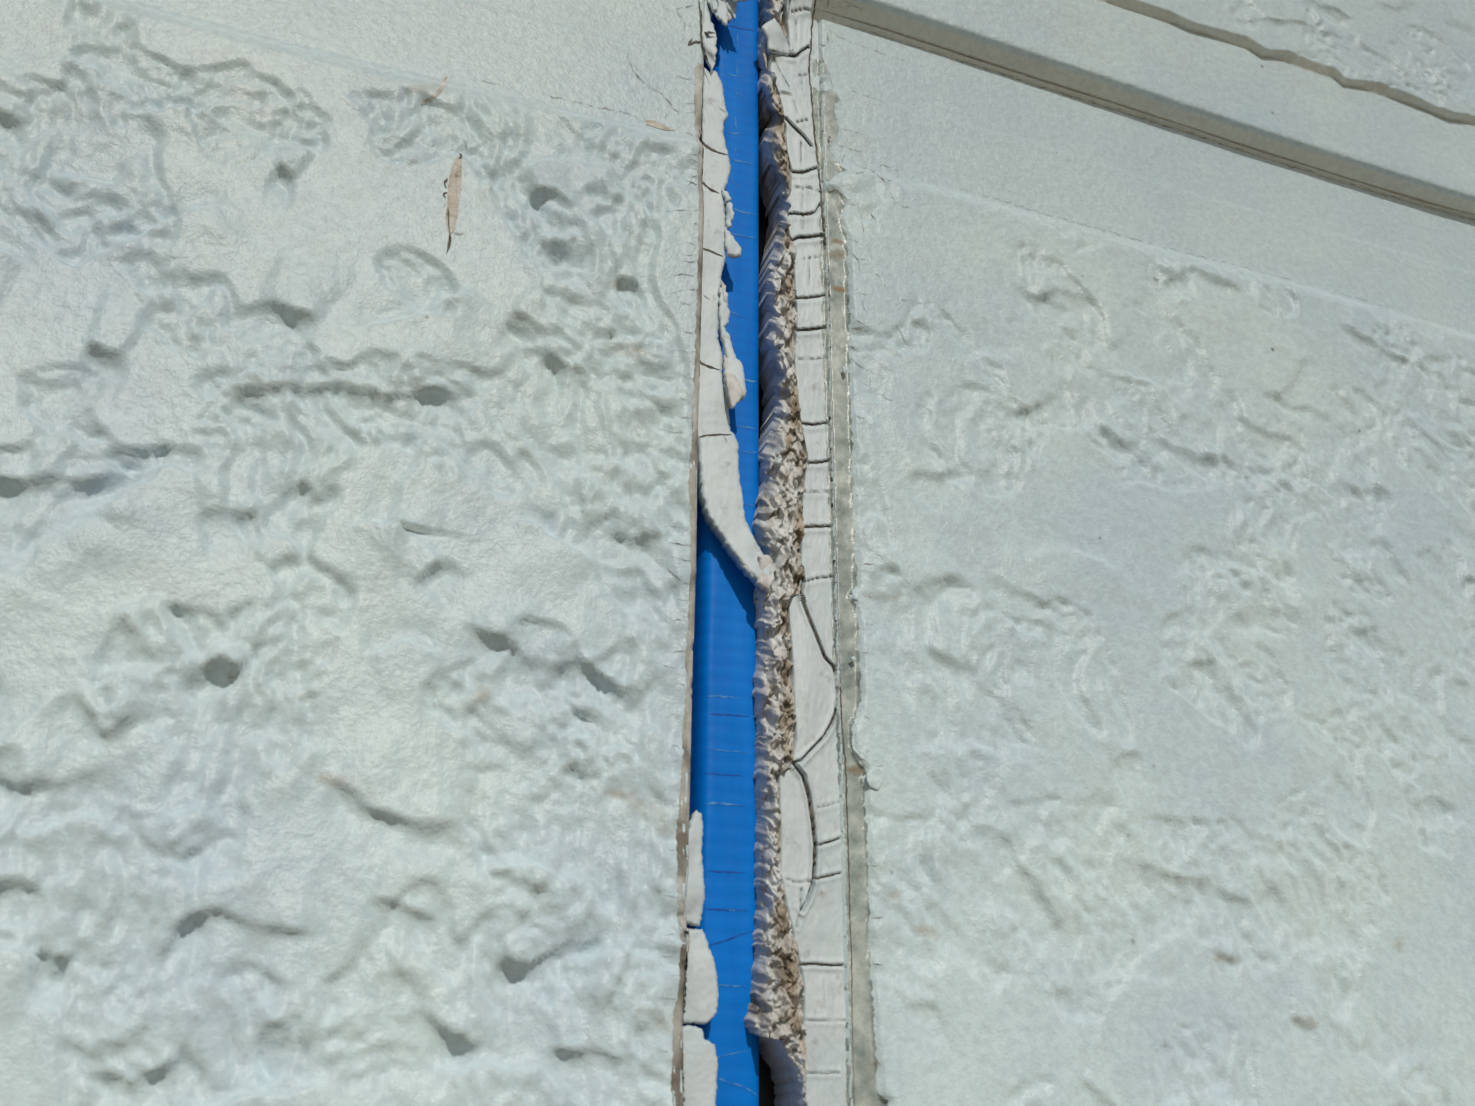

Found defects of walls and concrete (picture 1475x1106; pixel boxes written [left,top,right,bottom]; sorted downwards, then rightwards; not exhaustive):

peeling [671,0,748,1106]
crack [770,0,894,1106]